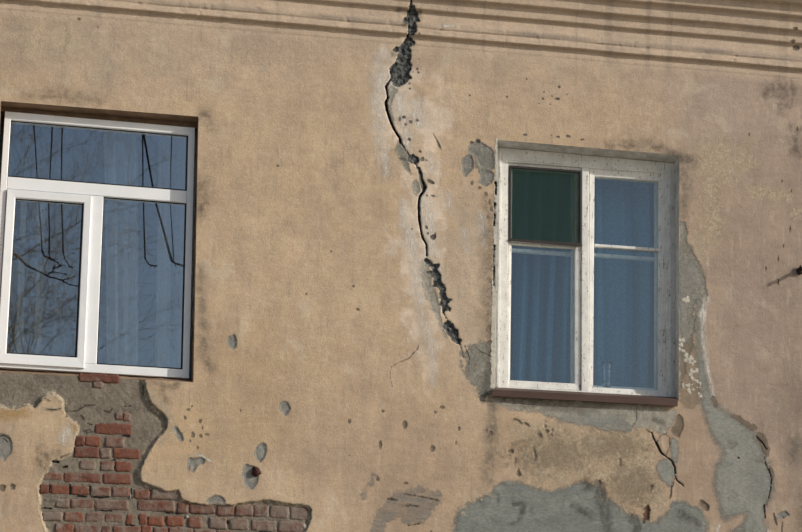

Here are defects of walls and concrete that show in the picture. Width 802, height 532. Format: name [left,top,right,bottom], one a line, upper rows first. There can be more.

crack [373,0,462,387]
flaking render [461,137,499,388]
spalling [227,334,237,349]
spalling [0,433,13,461]
spalling [149,390,212,473]
spalling [206,494,226,504]
spalling [242,443,267,489]
spalling [279,401,291,416]
crack [634,406,684,498]
flaking render [671,414,684,438]
flaking render [731,415,770,456]
crack [756,436,783,532]